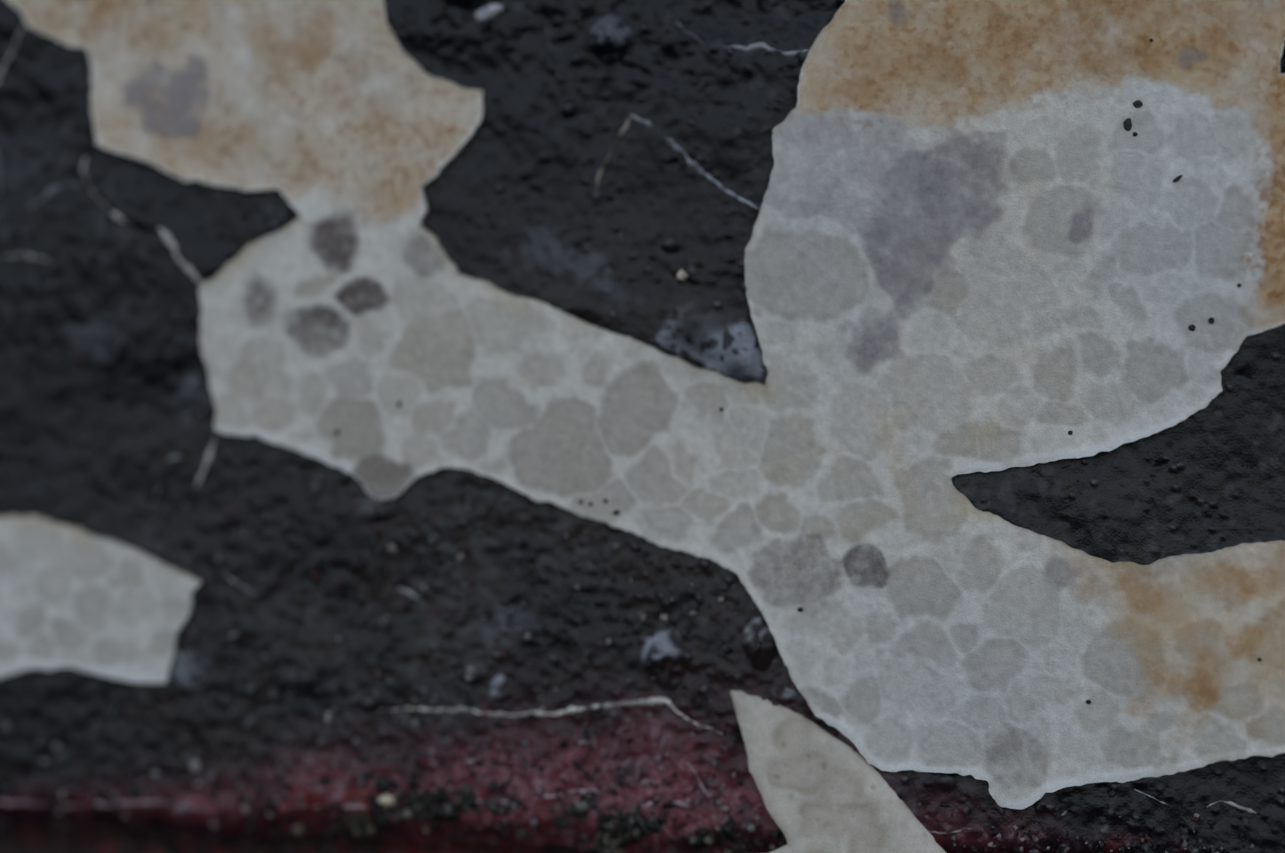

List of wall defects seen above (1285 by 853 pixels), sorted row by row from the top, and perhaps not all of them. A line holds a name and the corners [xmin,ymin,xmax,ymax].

peeling [475,4,504,22]
crack [596,114,760,210]
crack [27,157,201,284]
peeling [0,515,202,684]
crack [379,697,723,734]
crack [475,762,711,808]
peeling [730,690,947,853]